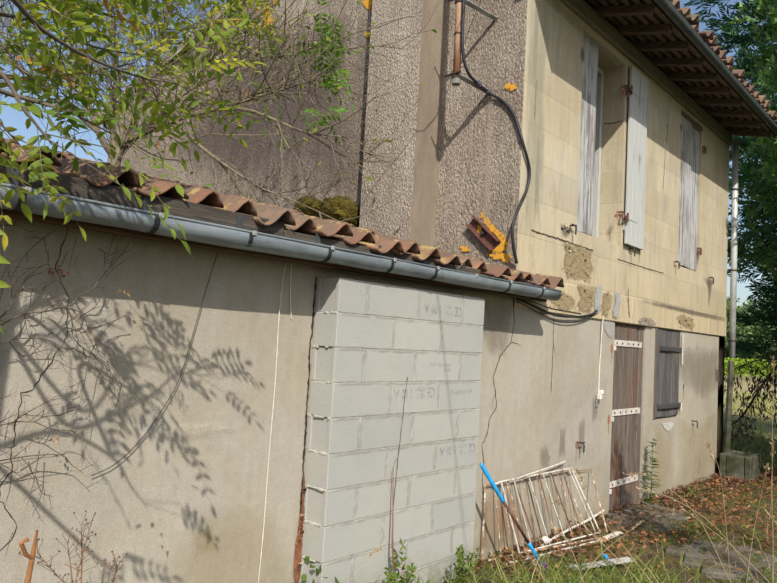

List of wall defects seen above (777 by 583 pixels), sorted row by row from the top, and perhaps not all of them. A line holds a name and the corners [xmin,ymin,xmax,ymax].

spalling [549,244,612,316]
crack [0,227,70,558]
crack [482,298,518,505]